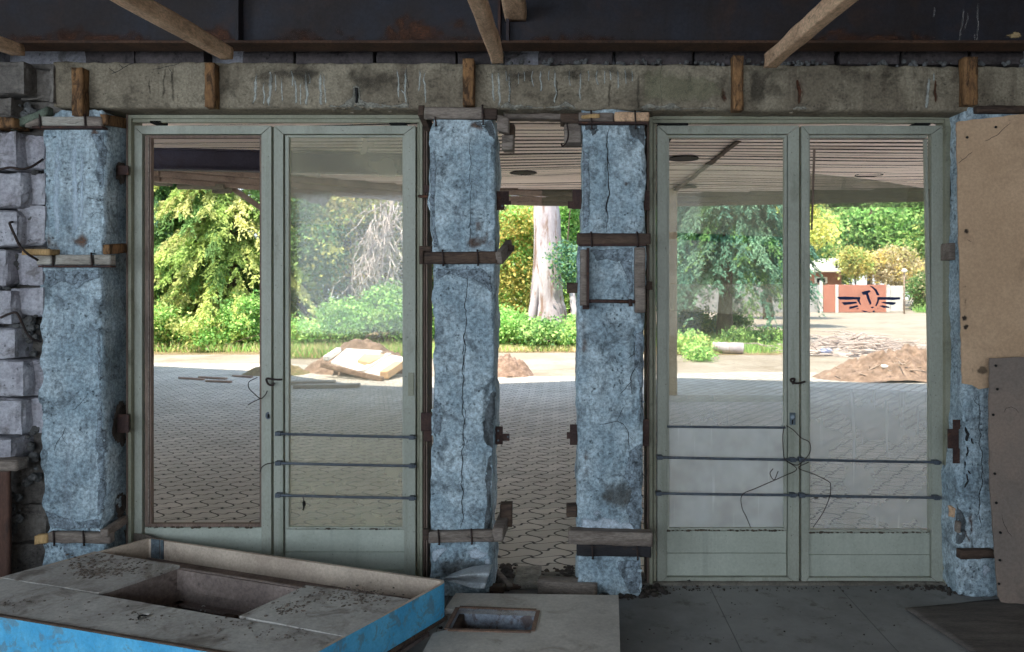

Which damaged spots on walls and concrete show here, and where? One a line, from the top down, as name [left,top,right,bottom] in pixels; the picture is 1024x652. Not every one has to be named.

damp [253,70,326,104]
crack [466,138,474,241]
crack [603,130,611,229]
crack [600,330,643,445]
spalling [956,507,966,544]